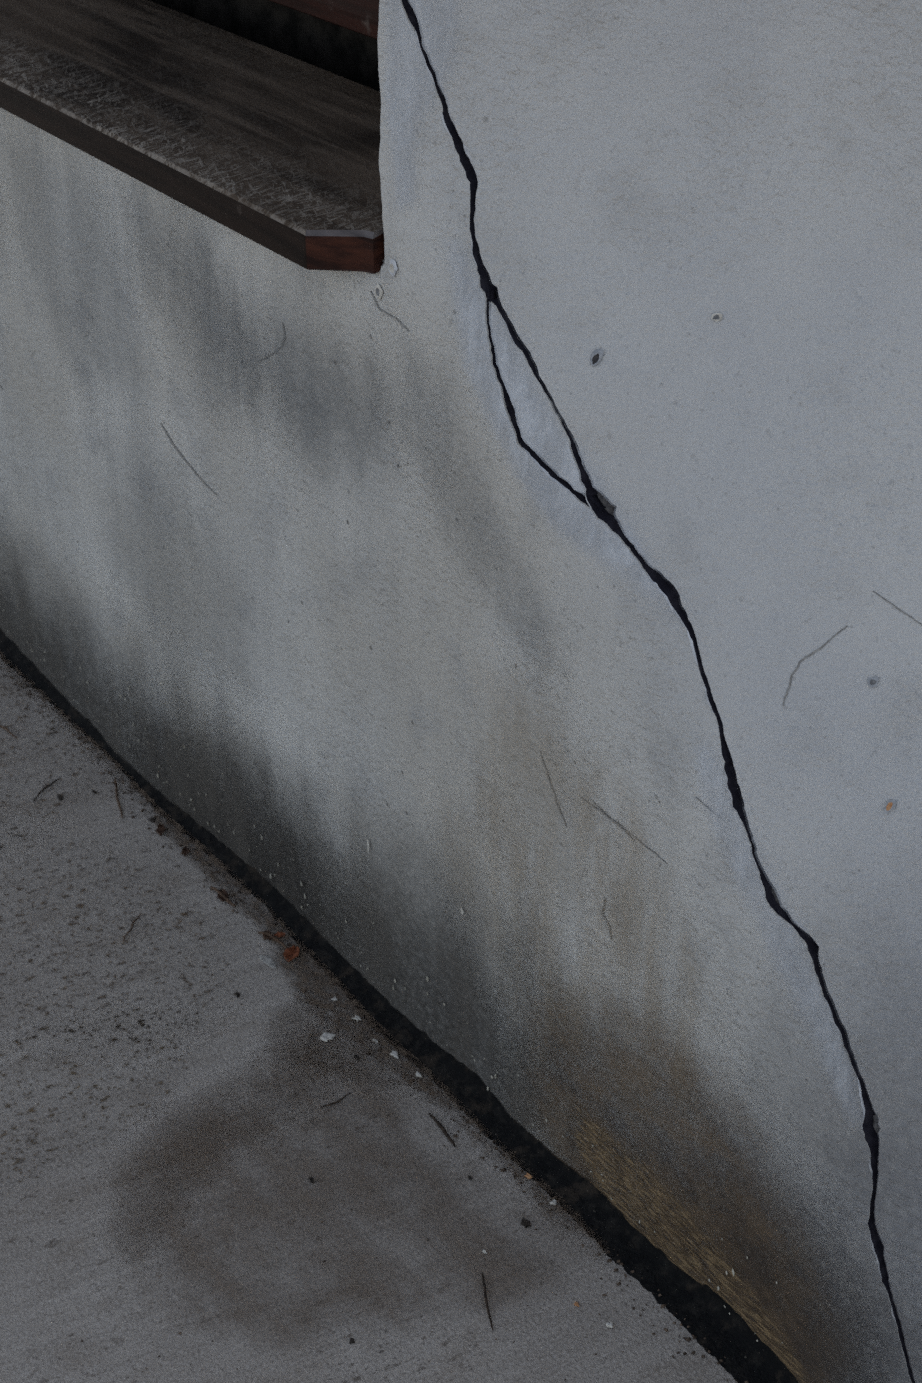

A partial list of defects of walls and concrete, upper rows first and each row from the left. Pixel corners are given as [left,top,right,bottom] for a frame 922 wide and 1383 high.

leakage [0,568,306,915]
crack [402,0,922,1383]
leakage [617,1168,922,1383]